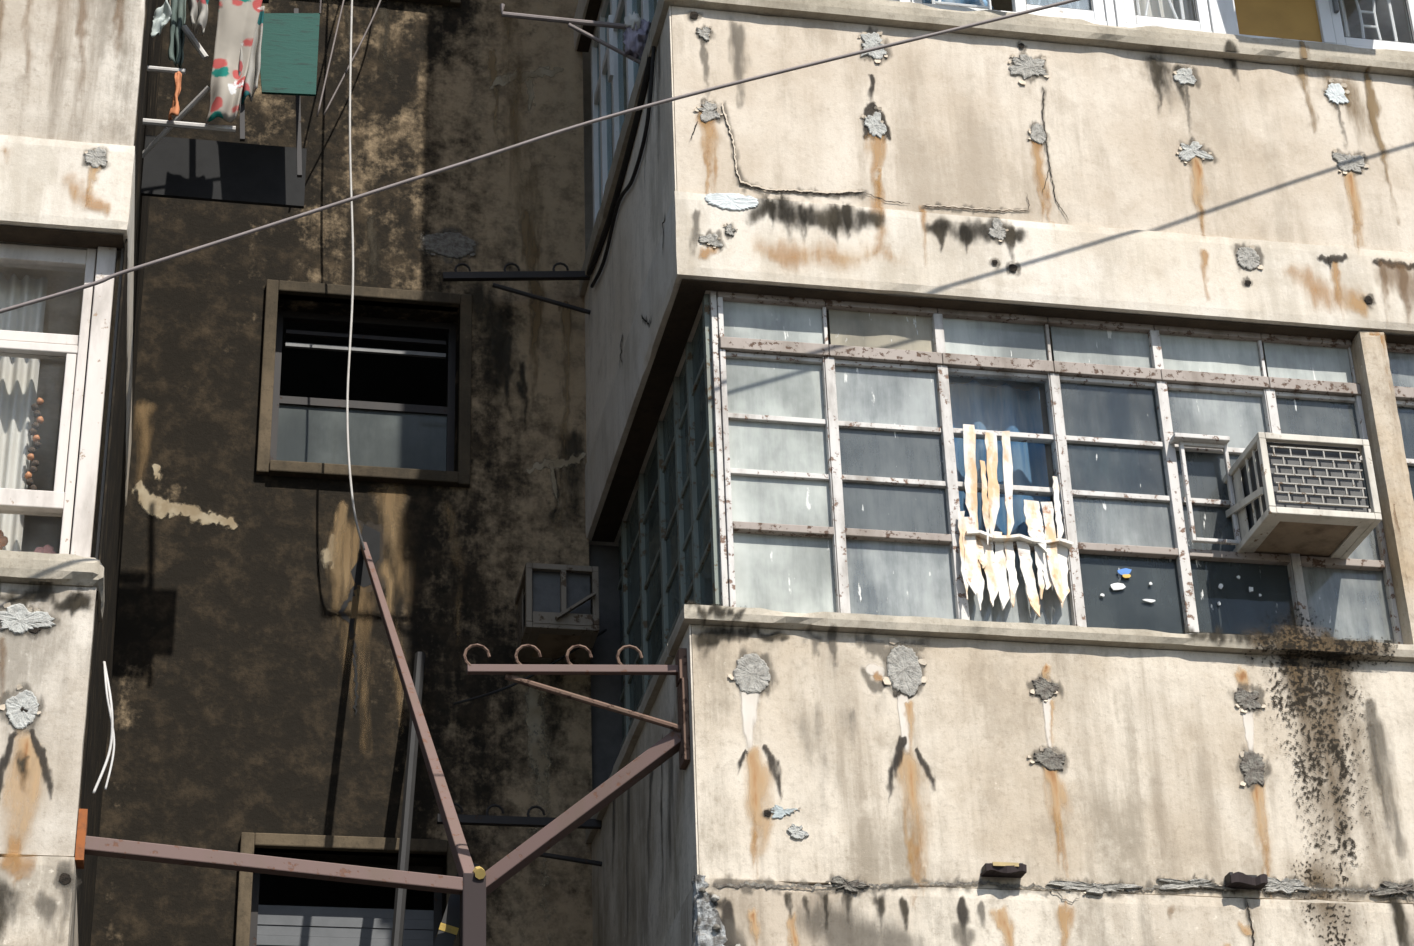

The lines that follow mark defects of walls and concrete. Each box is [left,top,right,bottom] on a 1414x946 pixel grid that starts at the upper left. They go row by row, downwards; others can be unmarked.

crack [691,89,1067,216]
leakage [751,195,884,237]
leakage [926,218,1024,250]
rust [1345,172,1360,224]
spalling [0,602,56,634]
spalling [0,684,43,732]
spalling [862,638,928,752]
rust [3,735,40,869]
rust [747,748,769,852]
leakage [1185,607,1398,946]
spalling [691,874,746,946]
leakage [1389,894,1409,946]